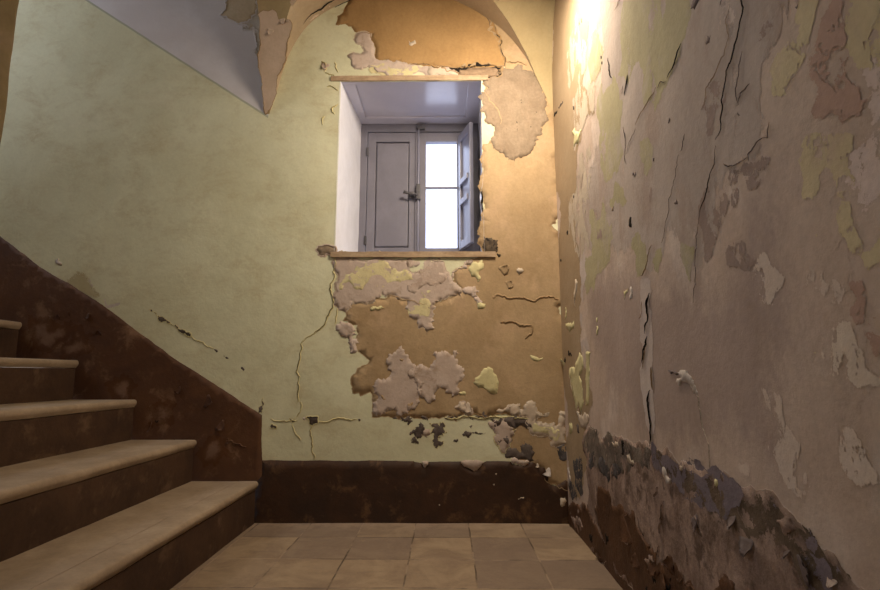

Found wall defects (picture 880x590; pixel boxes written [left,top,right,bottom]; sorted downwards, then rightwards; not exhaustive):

peeling [219,0,292,115]
crack [304,0,350,23]
crack [623,44,681,163]
crack [693,0,769,296]
peeling [728,156,771,208]
peeling [315,0,698,590]
crack [639,134,685,447]
crack [271,257,357,460]
peeling [714,573,735,590]
peeling [726,496,851,590]